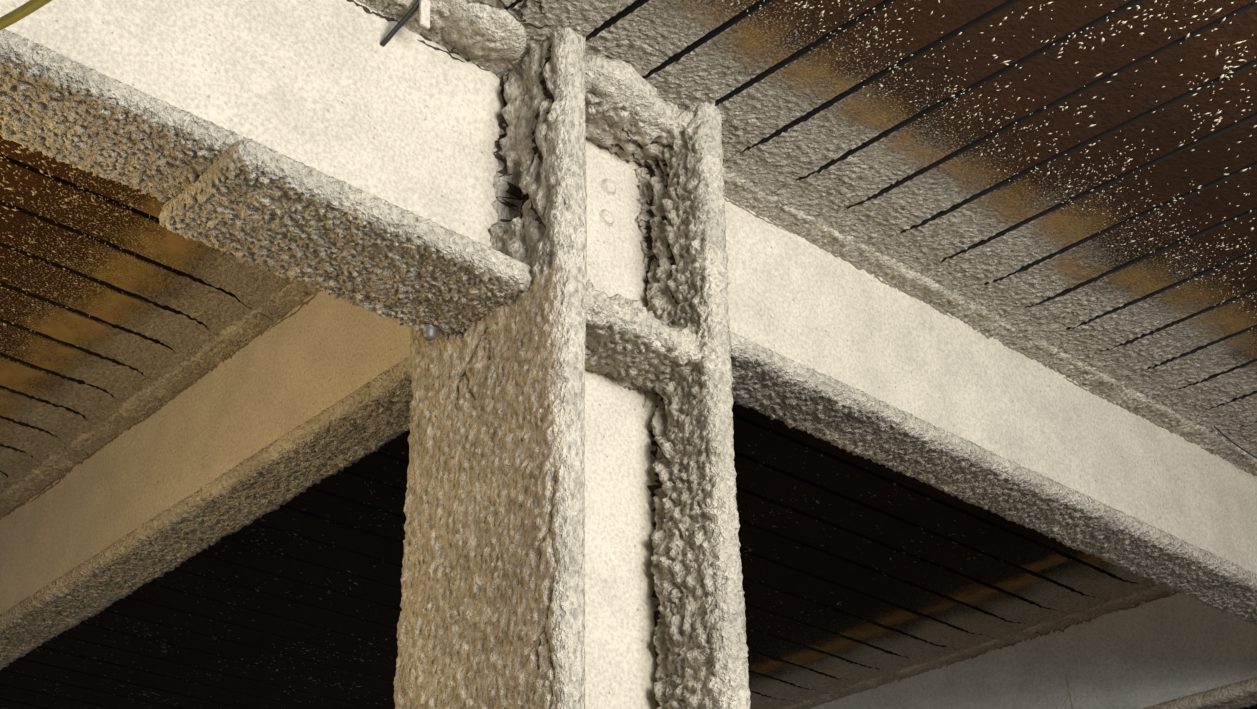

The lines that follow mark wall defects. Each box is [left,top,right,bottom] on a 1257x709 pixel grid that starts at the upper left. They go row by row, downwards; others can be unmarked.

spalling [511,152,535,236]
rust [0,230,196,409]
crack [537,473,559,709]